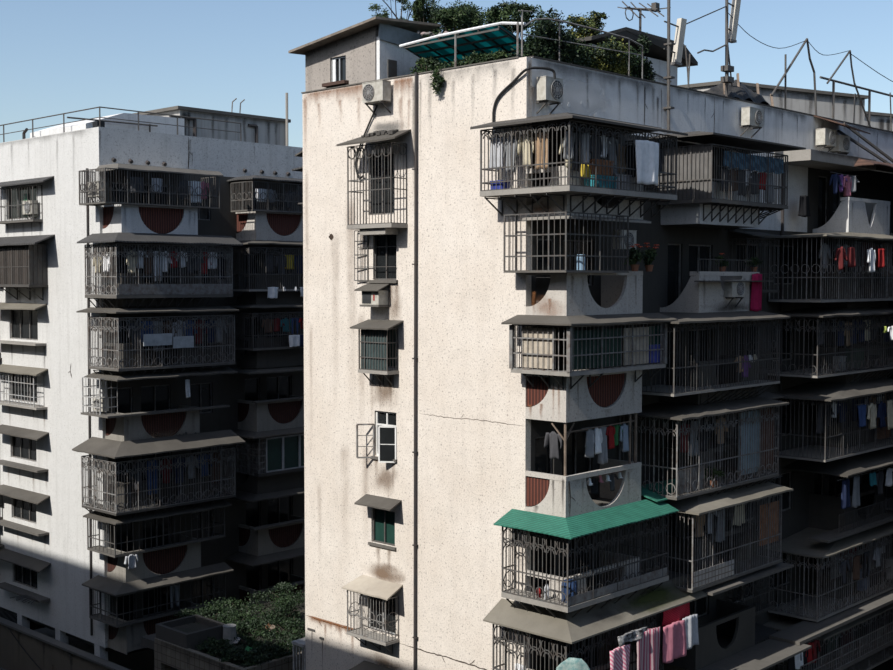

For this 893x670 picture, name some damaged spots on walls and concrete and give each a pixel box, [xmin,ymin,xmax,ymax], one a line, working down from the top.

crack [429,414,521,426]
rust [311,616,353,630]
crack [400,643,487,670]